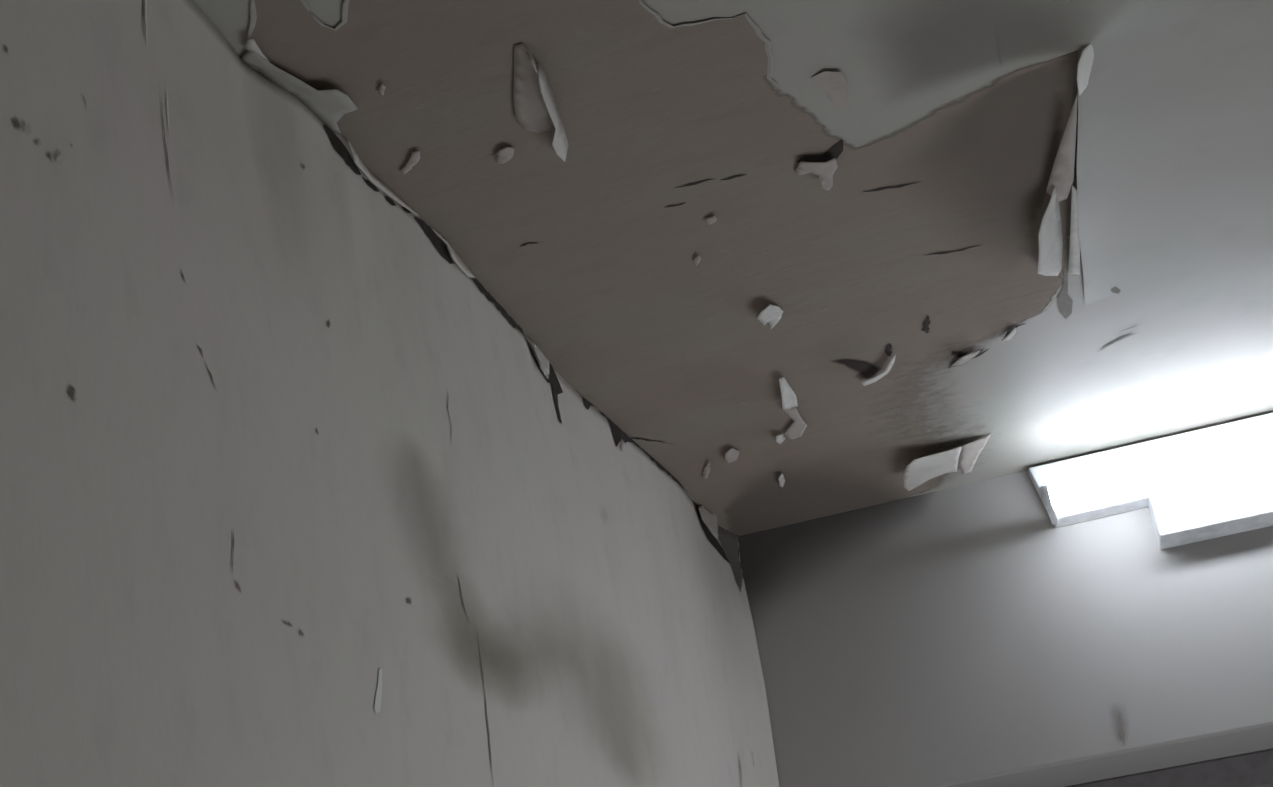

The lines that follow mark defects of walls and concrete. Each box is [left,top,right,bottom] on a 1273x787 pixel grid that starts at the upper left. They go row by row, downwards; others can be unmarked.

peeling [247,0,1078,562]